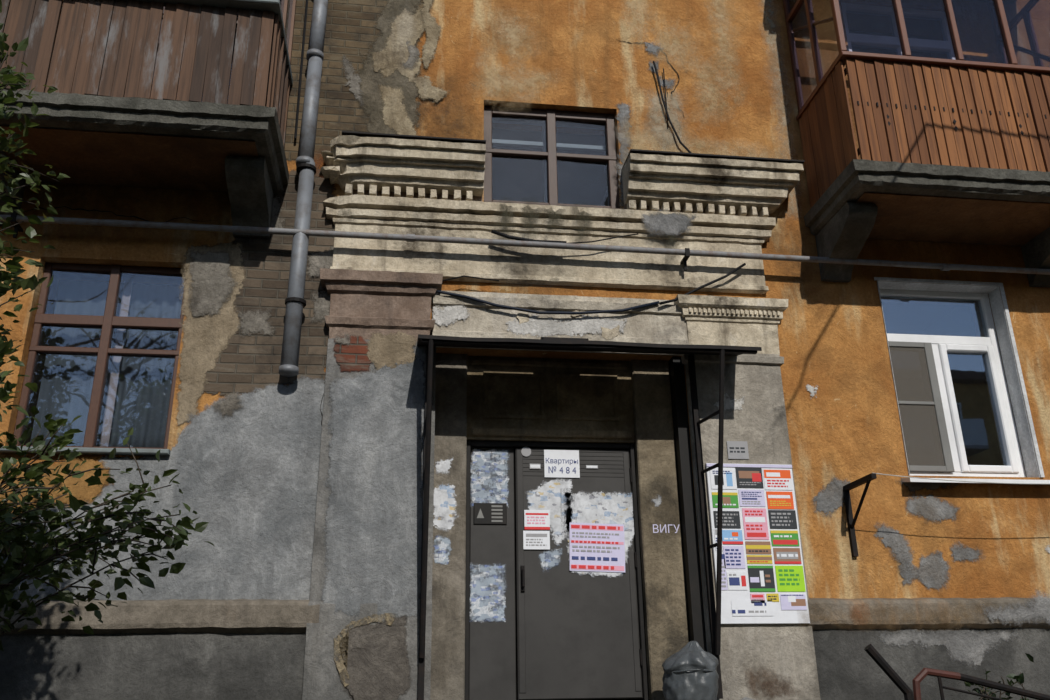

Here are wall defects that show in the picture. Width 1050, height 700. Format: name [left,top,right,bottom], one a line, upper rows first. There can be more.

peeling [188,0,448,418]
damp [501,203,560,229]
peeling [432,305,469,328]
spalling [901,481,959,493]
spalling [334,613,410,700]